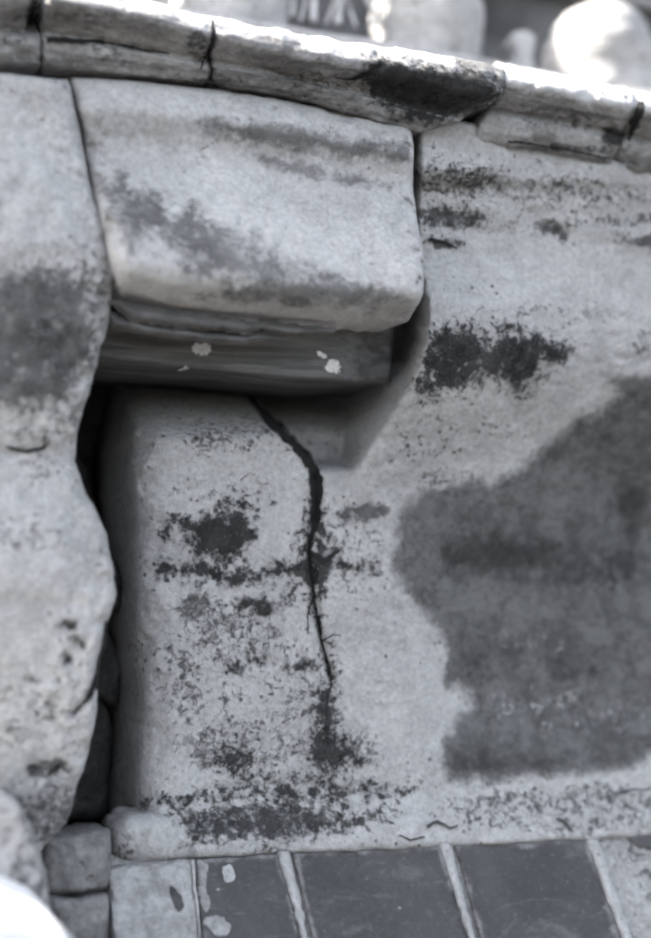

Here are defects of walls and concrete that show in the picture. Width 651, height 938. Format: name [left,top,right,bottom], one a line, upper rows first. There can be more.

crack [200,20,216,82]
crack [508,101,645,165]
damp [402,317,578,406]
damp [150,490,277,571]
crack [248,396,340,720]
damp [287,522,339,602]
damp [336,501,390,522]
damp [393,374,651,781]
damp [282,656,329,674]
damp [214,685,378,792]
peeling [170,886,184,912]